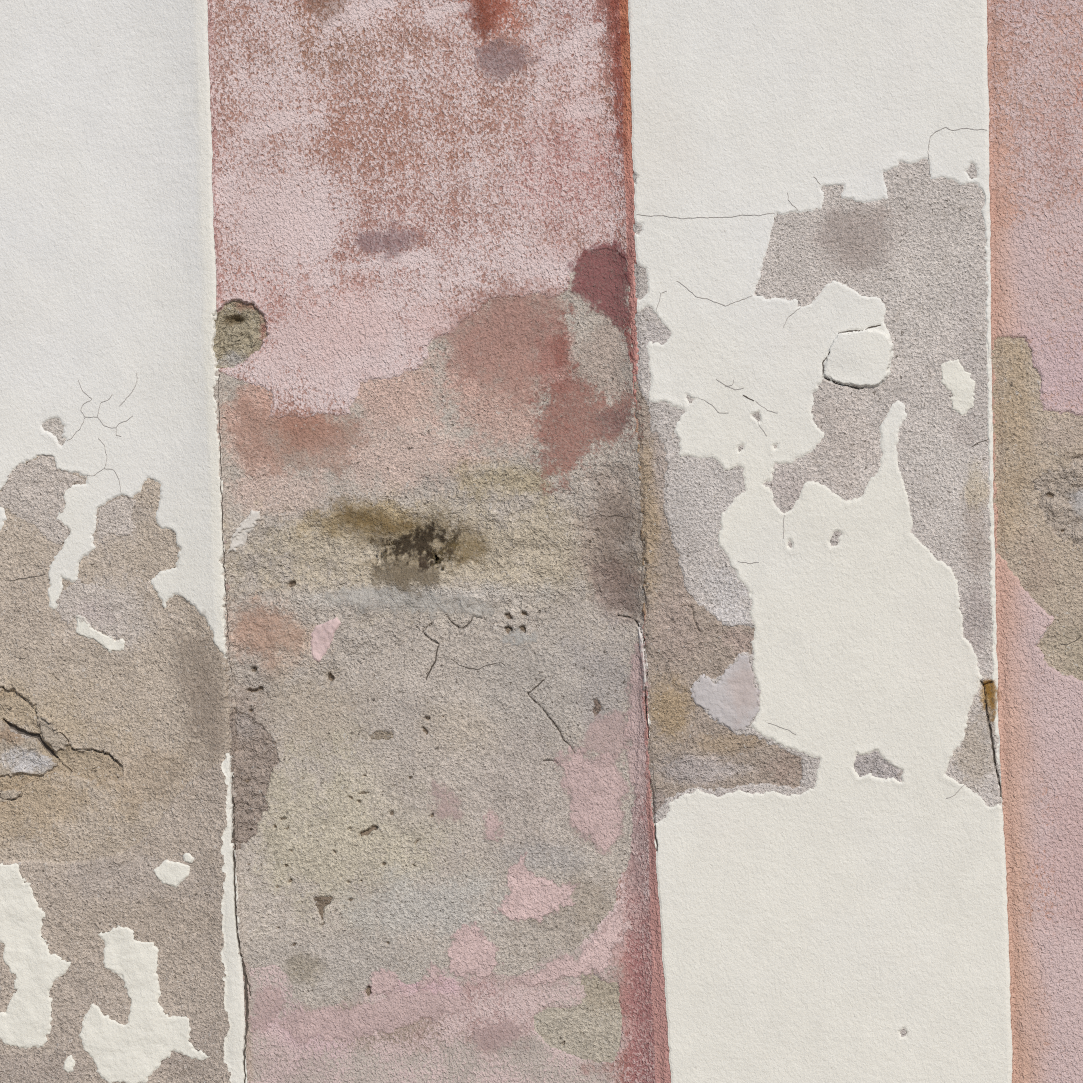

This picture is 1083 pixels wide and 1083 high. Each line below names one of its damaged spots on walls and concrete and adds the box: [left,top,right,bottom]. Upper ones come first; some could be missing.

crack [68,373,138,492]
peeling [754,159,1083,807]
damp [326,518,494,619]
peeling [0,252,820,1083]
crack [422,615,503,680]
crack [527,679,575,764]
corrosion [982,680,997,721]
crack [232,755,251,1083]